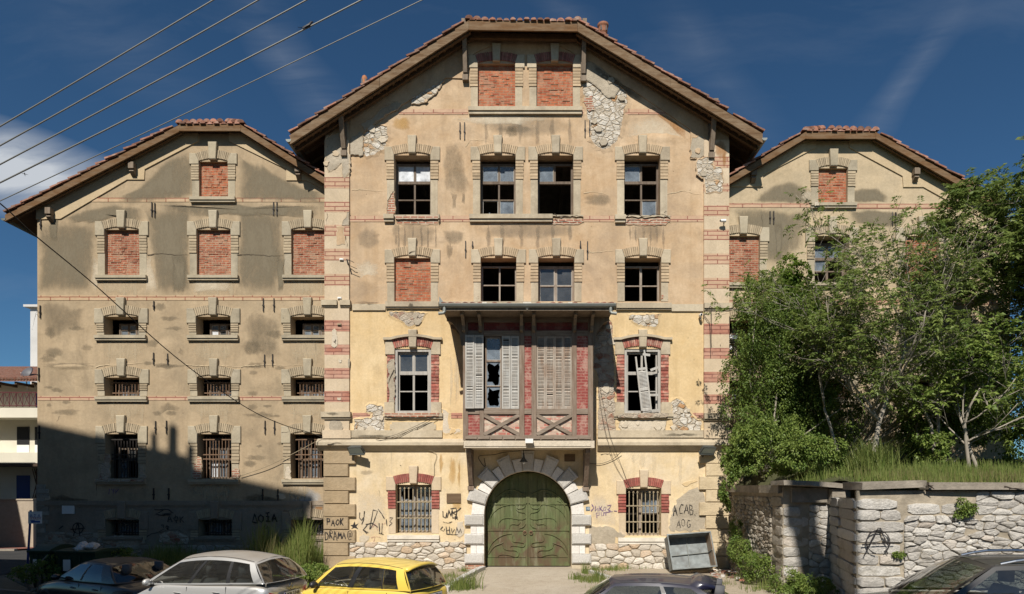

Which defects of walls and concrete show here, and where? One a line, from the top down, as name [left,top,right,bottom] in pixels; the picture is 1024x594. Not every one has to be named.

flaking render [580,61,632,154]
flaking render [323,123,392,178]
water stain [43,159,323,295]
flaking render [387,309,428,329]
flaking render [628,312,662,330]
water stain [108,343,138,361]
water stain [198,341,229,361]
flaking render [593,315,726,435]
flaking render [351,359,463,436]
water stain [109,403,144,420]
water stain [199,402,229,423]
water stain [293,403,331,418]